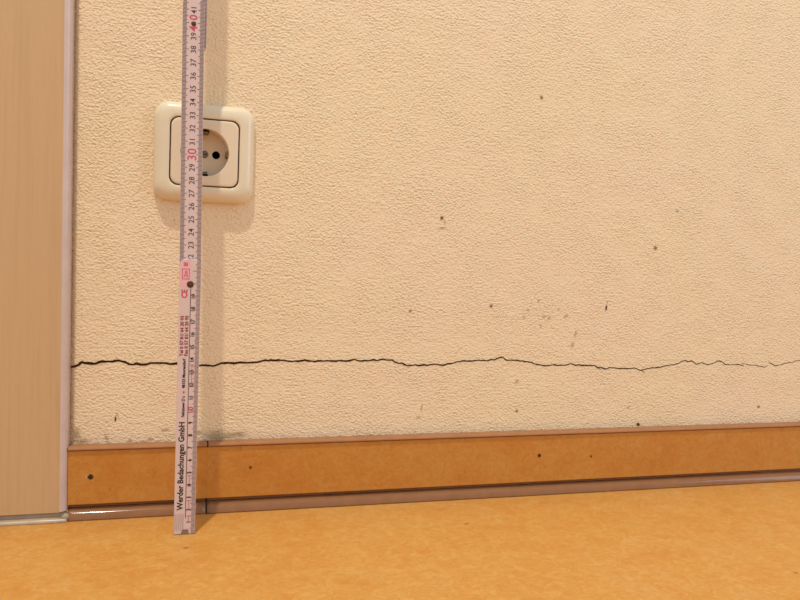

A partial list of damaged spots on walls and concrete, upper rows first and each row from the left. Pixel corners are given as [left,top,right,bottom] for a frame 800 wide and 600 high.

crack [71,359,177,368]
crack [199,357,800,372]